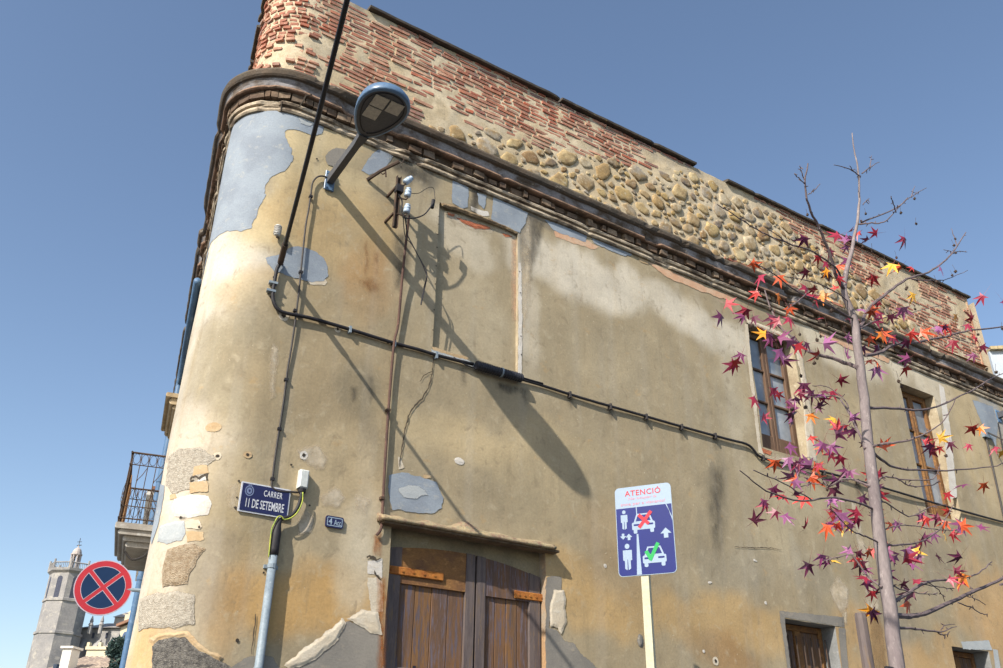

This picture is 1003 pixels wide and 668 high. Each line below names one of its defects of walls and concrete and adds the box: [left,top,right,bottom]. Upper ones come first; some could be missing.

flaking render [138,447,384,668]
flaking render [545,576,596,668]